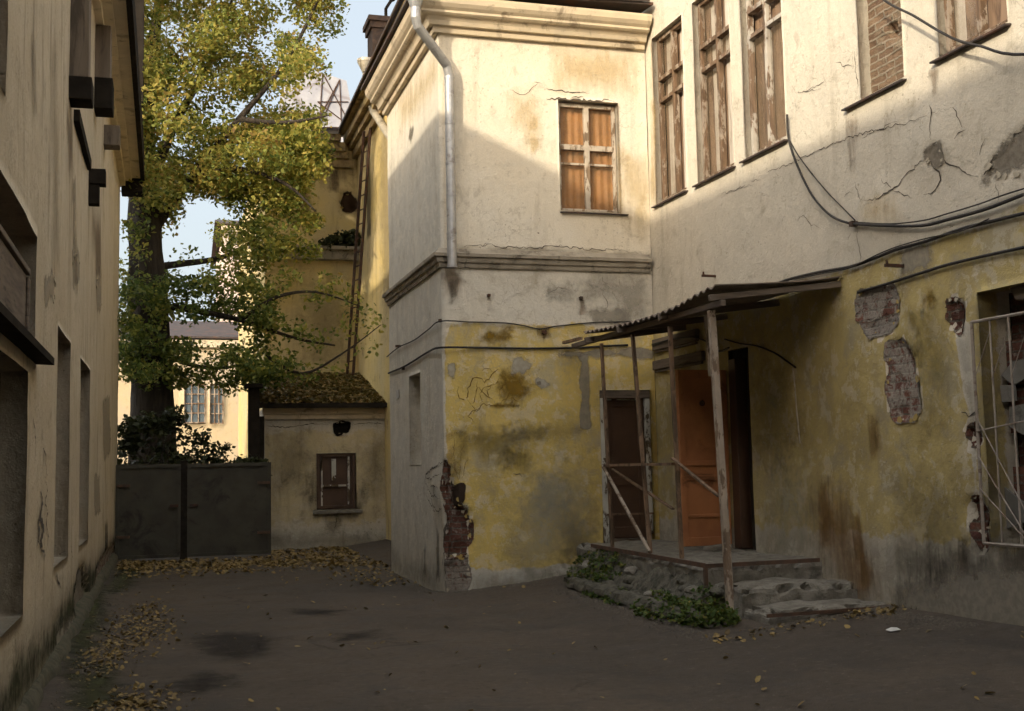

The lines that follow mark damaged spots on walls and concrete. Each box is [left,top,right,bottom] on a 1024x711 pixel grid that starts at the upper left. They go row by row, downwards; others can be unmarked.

crack [514,82,614,102]
crack [723,105,999,201]
peeling [982,127,1024,184]
crack [464,243,631,253]
flaking render [945,296,965,336]
flaking render [854,283,921,424]
leakage [494,371,529,407]
flaking render [962,412,982,448]
crack [425,368,515,592]
flaking render [440,460,474,592]
flaking render [969,495,990,552]